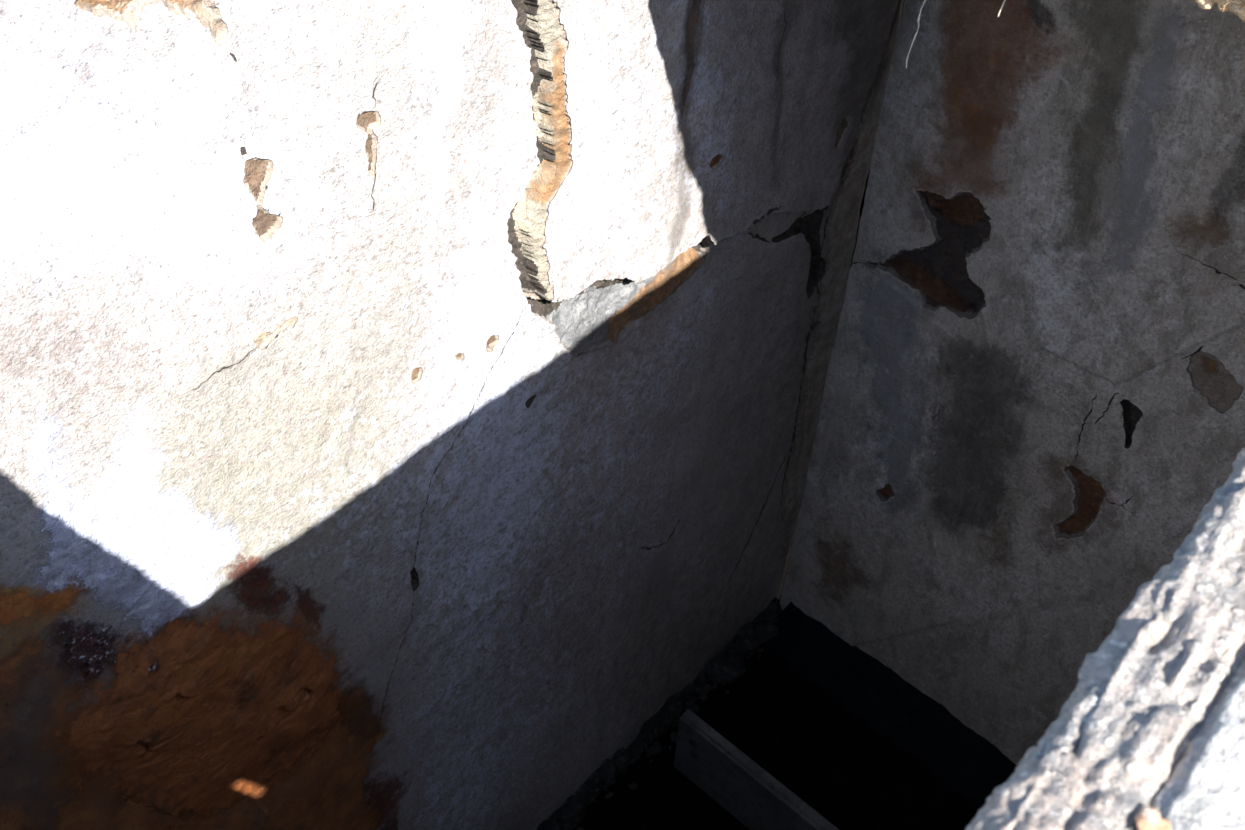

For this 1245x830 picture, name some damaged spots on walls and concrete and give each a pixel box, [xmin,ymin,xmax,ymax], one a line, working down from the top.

spalling [74,0,229,46]
rust [942,0,1054,138]
peeling [356,110,381,180]
peeling [240,147,284,242]
peeling [863,190,991,320]
crack [379,0,573,726]
flaking render [1120,399,1143,449]
peeling [1186,350,1244,414]
water stain [27,402,239,638]
peeling [1053,465,1107,539]
rust [229,557,325,629]
rust [0,576,405,830]